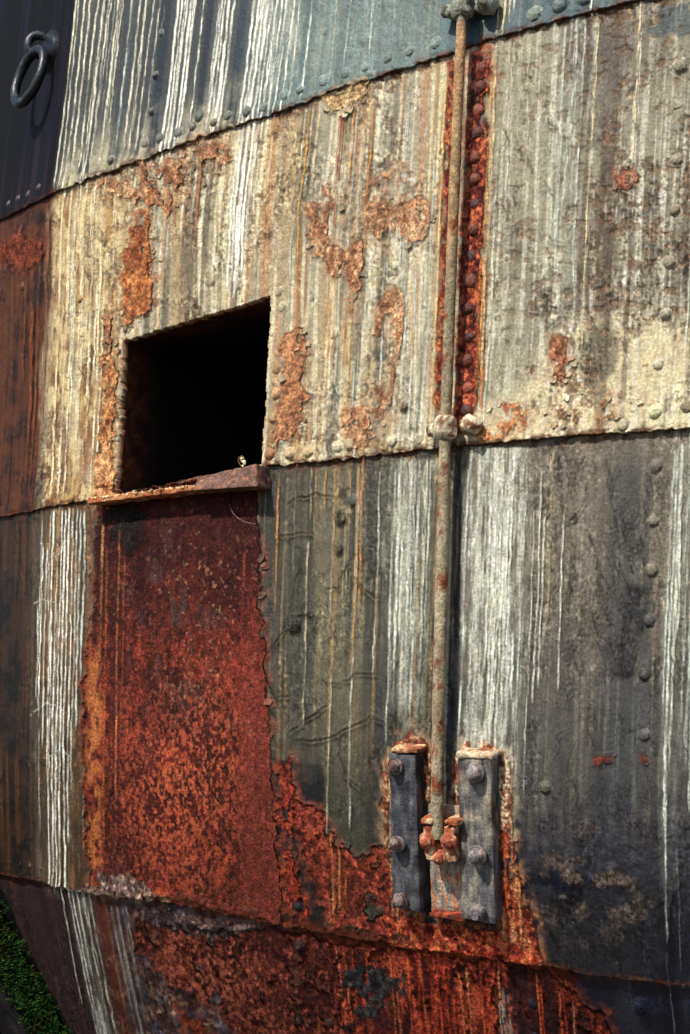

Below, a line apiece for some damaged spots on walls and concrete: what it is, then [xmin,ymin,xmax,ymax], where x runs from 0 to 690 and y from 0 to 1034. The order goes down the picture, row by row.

corrosion [0,215,49,307]
corrosion [22,310,46,462]
leakage [159,0,204,162]
leakage [208,0,235,131]
leakage [226,0,312,293]
leakage [398,193,440,441]
corrosion [433,48,528,441]
peeling [76,135,610,1034]
leakage [663,444,690,711]
leakage [37,509,115,1034]
corrosion [381,730,542,968]
leakage [663,731,671,876]